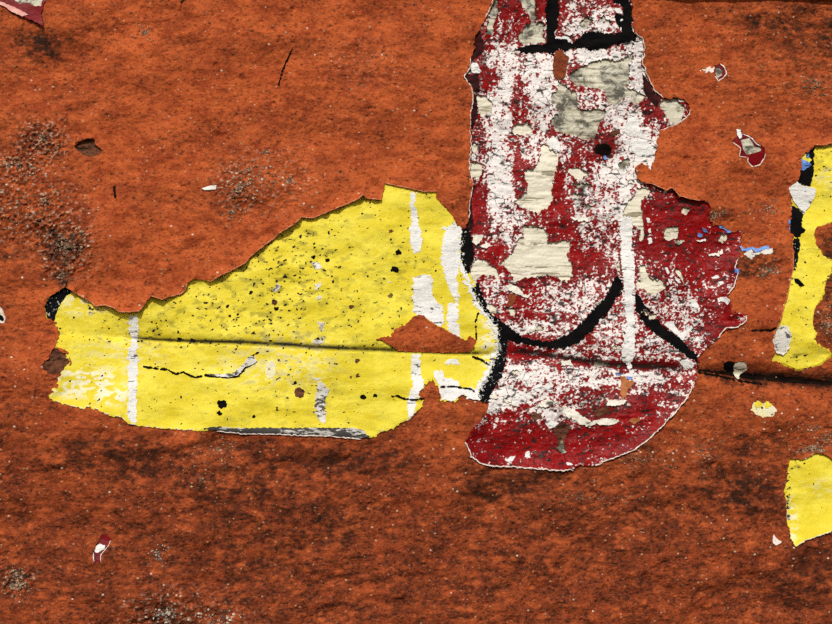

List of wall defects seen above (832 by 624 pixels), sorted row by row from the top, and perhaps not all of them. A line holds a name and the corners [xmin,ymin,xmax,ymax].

peeling [0,0,46,26]
peeling [42,0,773,472]
peeling [772,142,832,371]
crack [697,369,832,387]
peeling [751,400,777,418]
peeling [772,453,832,546]
peeling [93,533,112,562]